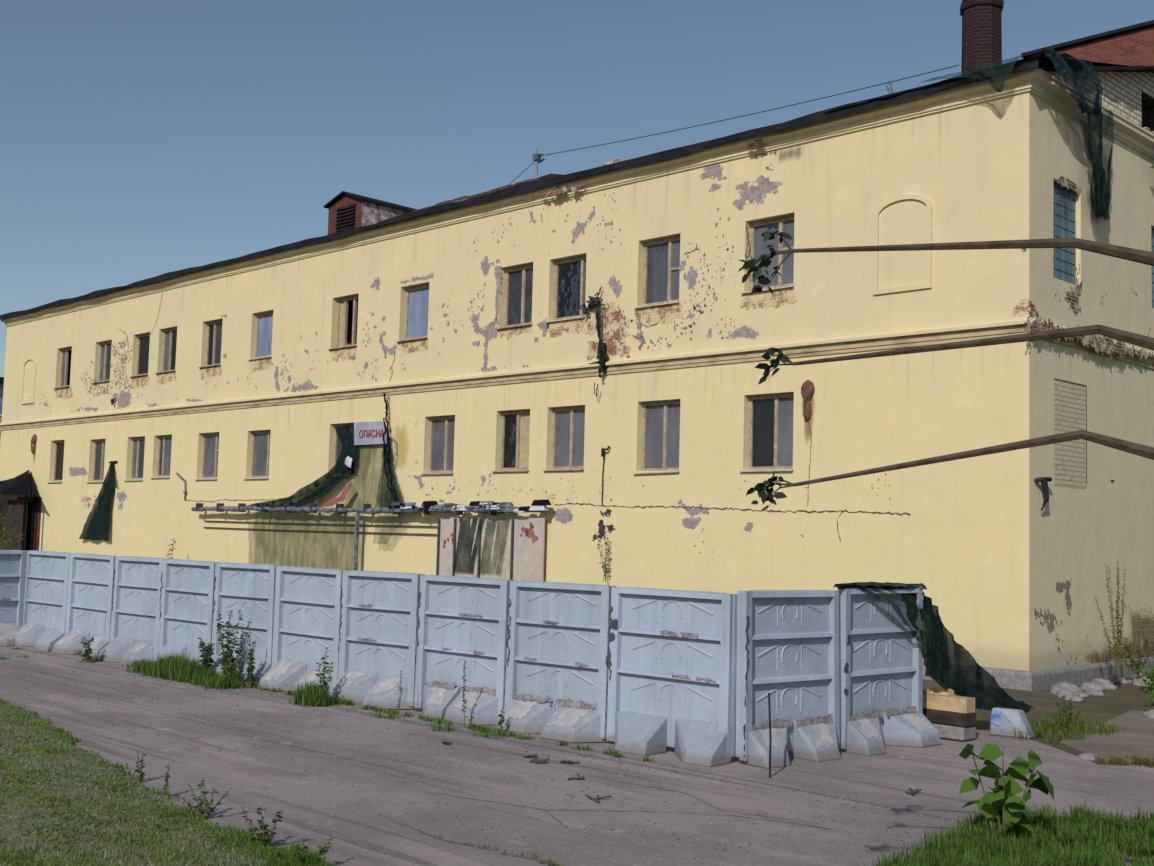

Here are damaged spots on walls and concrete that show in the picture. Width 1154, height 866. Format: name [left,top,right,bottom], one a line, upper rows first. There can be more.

spalling [540,182,584,198]
peeling [699,139,783,211]
peeling [571,206,613,244]
spalling [300,256,695,373]
peeling [679,261,698,289]
peeling [726,325,759,339]
spalling [740,284,797,311]
spalling [1011,282,1154,360]
spalling [44,330,177,412]
crack [555,422,910,541]
peeling [678,499,709,530]
peeling [1034,579,1072,633]